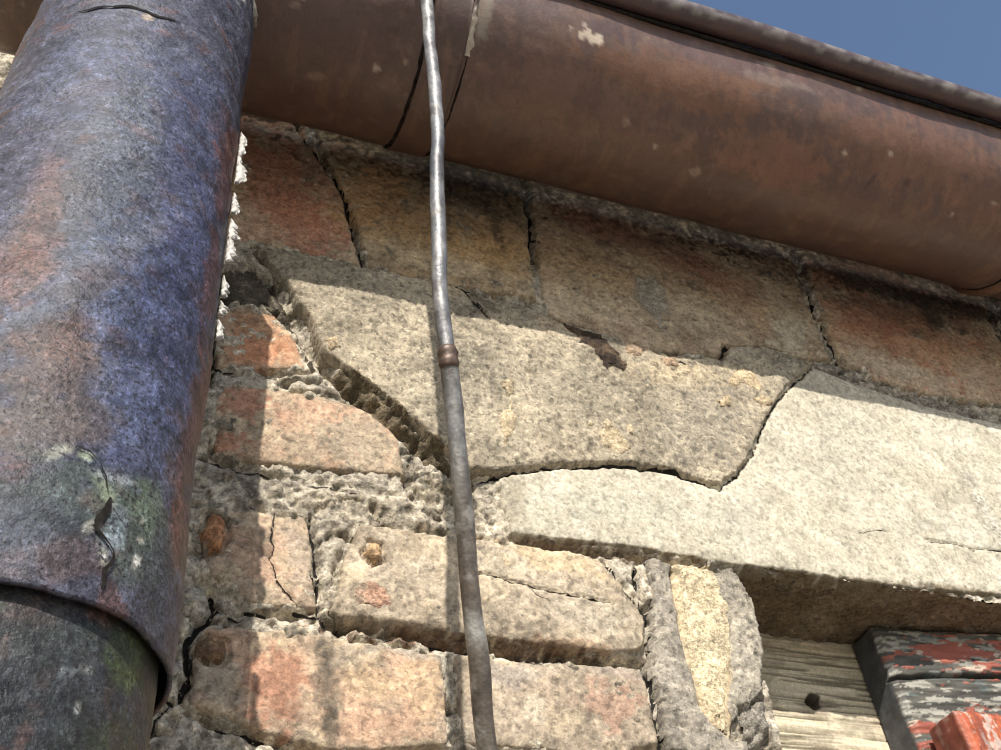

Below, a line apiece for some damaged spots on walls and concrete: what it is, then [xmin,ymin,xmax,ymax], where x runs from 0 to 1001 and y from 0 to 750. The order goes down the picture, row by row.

crack [292,123,362,268]
crack [524,211,540,265]
crack [210,341,234,383]
spalling [562,322,649,370]
crack [804,292,838,366]
crack [471,369,812,492]
crack [268,513,339,638]
crack [149,598,268,747]
crack [427,647,468,656]